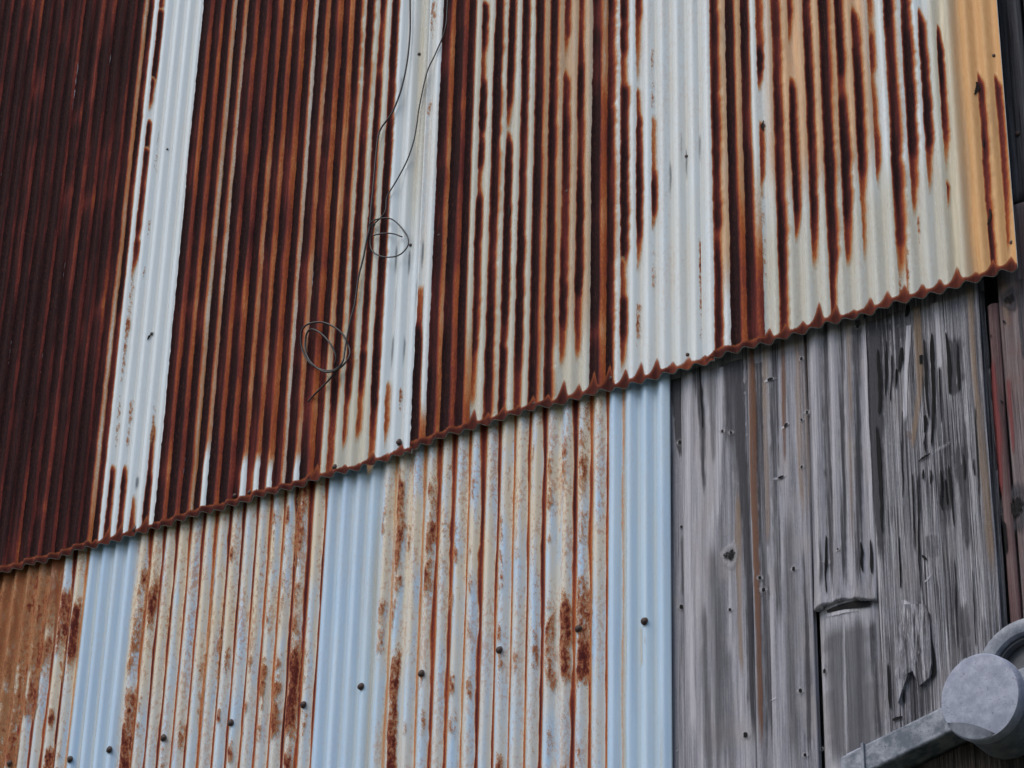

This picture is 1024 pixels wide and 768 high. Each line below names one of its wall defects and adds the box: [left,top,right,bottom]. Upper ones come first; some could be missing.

corrosion [131,119,152,277]
corrosion [149,0,165,109]
corrosion [342,0,376,447]
corrosion [355,0,387,438]
corrosion [506,0,518,128]
corrosion [619,0,630,368]
corrosion [635,87,644,268]
corrosion [755,0,765,90]
corrosion [867,0,882,181]
corrosion [900,0,935,212]
corrosion [936,25,950,163]
corrosion [423,439,444,768]